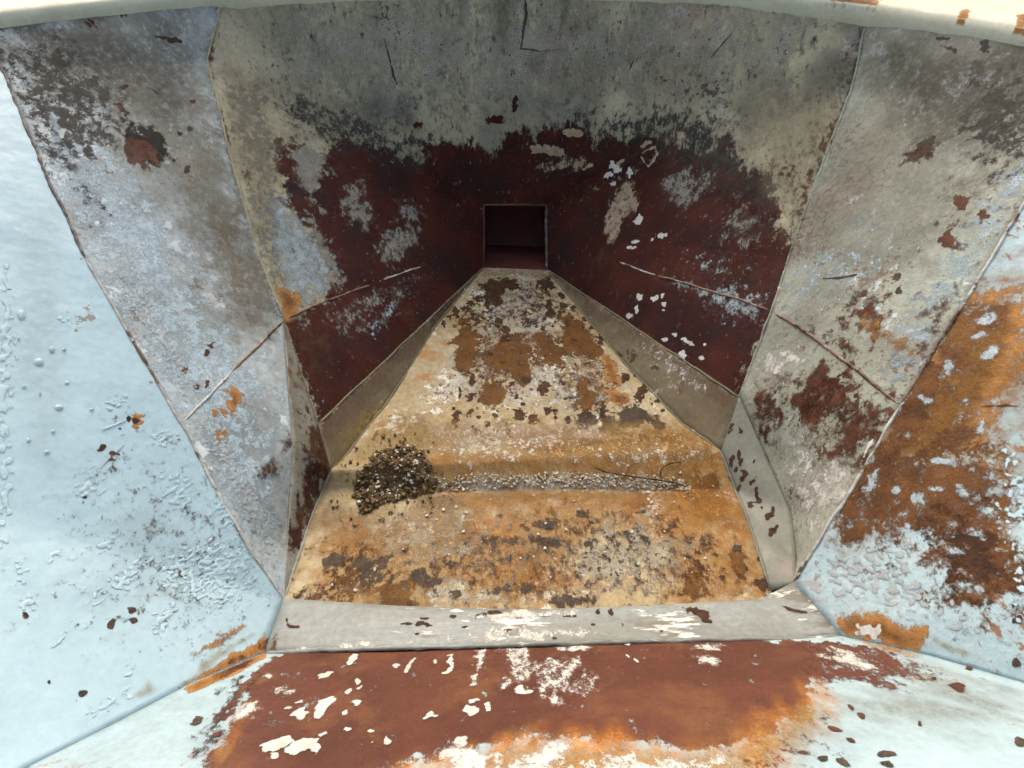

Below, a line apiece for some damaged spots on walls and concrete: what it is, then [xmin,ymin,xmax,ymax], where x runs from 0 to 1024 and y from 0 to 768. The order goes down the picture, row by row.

rust [113,102,190,173]
peeling [217,92,849,422]
rust [932,174,1017,267]
rust [255,315,768,609]
rust [753,273,1024,641]
rust [184,615,278,693]
peeling [400,617,433,635]
peeling [449,610,502,628]
peeling [682,607,712,624]
rust [837,610,931,655]
peeling [190,630,965,768]
rust [548,698,845,768]